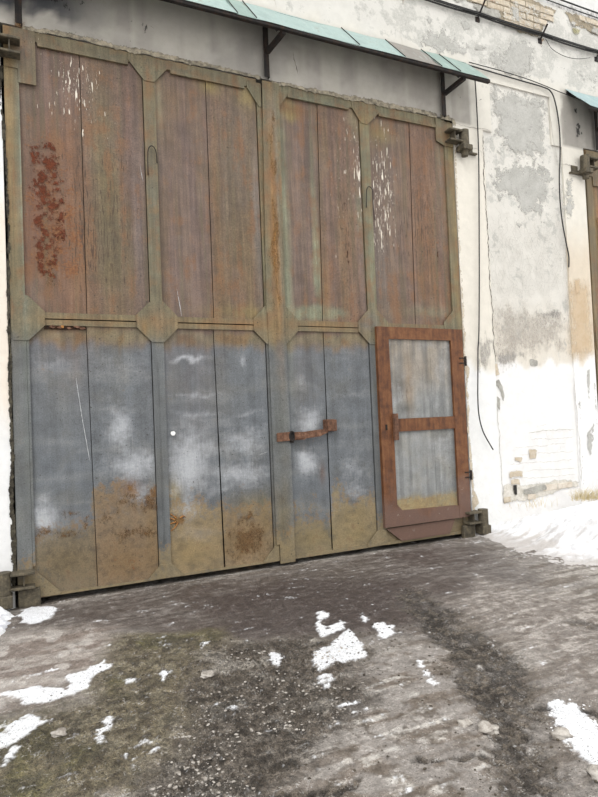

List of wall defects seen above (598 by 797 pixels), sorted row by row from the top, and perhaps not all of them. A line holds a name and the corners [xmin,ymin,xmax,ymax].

peeling [421,16,486,55]
spalling [456,0,598,36]
peeling [490,84,554,216]
rust [30,142,67,282]
leakage [481,308,560,366]
spalling [502,449,584,504]